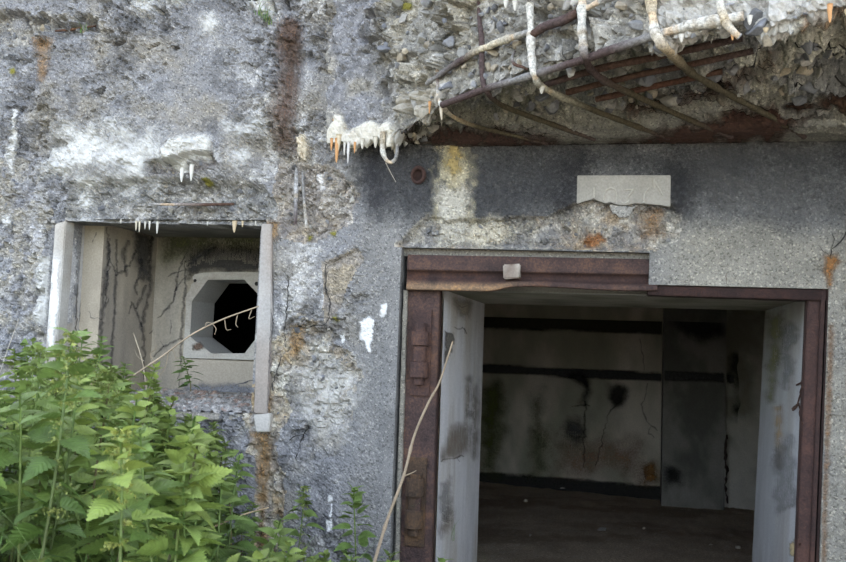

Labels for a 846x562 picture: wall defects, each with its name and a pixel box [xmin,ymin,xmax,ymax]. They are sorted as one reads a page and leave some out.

water stain [650,0,846,57]
corrosion [272,19,300,149]
water stain [392,79,450,125]
spalling [377,0,807,164]
corrosion [625,62,774,114]
corrosion [614,93,846,144]
spalling [0,153,56,403]
spalling [65,149,361,244]
spalling [394,201,682,252]
water stain [326,114,846,248]
crack [820,232,846,258]
corrosion [251,430,270,547]